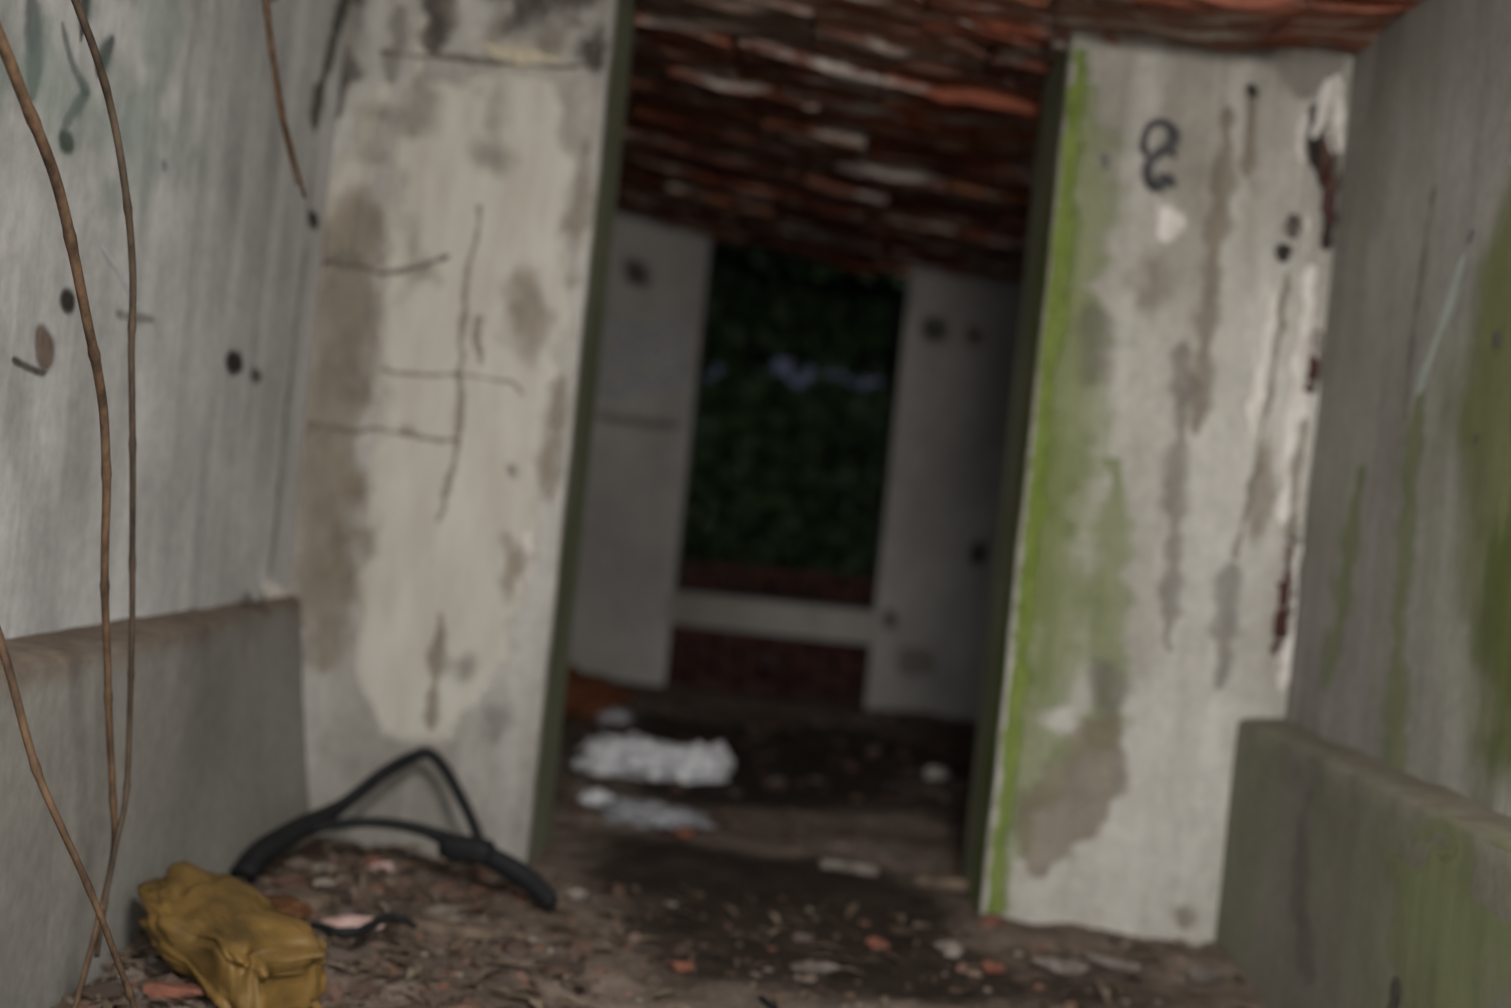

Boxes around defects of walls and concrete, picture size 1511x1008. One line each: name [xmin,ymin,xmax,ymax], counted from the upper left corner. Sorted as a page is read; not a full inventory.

water stain [422,0,453,53]
water stain [506,0,594,28]
water stain [1193,108,1233,434]